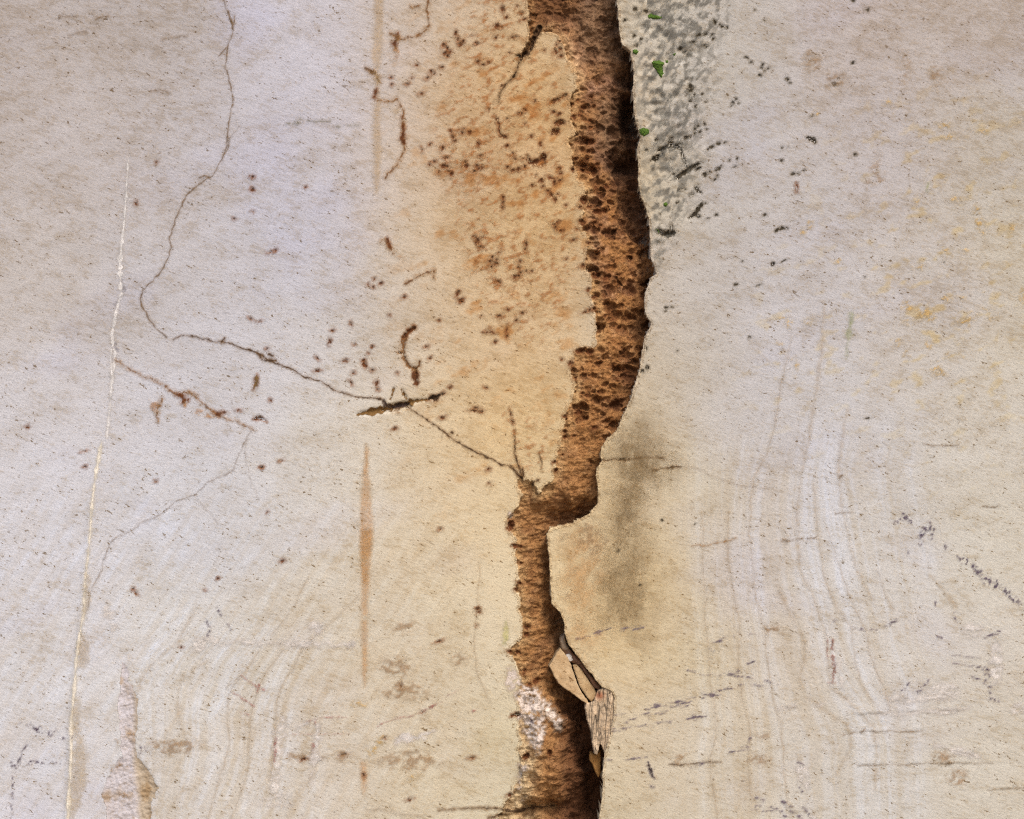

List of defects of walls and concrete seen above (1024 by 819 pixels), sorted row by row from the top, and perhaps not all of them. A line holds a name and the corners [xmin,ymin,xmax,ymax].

spalling [426,31,479,79]
damp [641,0,719,232]
crack [140,0,383,400]
spalling [421,128,483,176]
spalling [505,94,609,255]
spalling [581,263,620,330]
crack [116,360,246,427]
spalling [342,325,452,416]
spalling [560,348,619,380]
peeling [548,647,596,703]
damp [505,668,562,753]